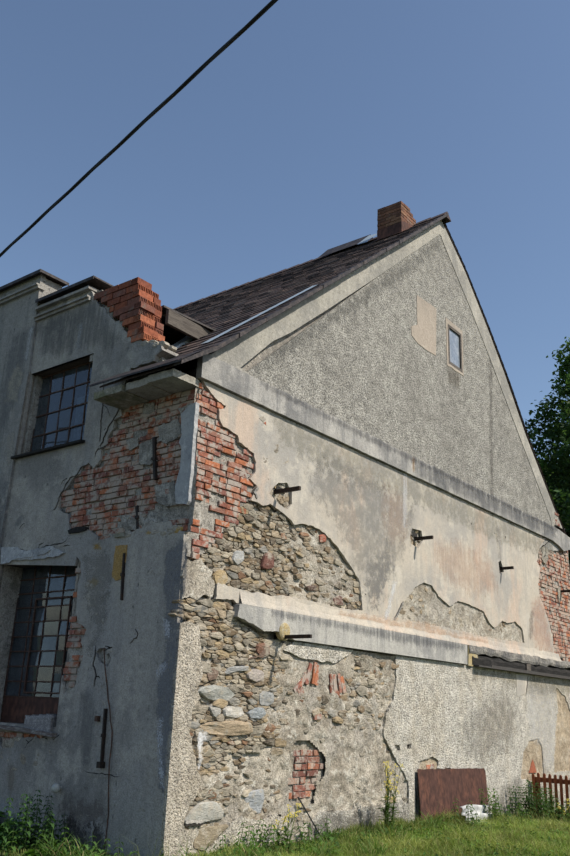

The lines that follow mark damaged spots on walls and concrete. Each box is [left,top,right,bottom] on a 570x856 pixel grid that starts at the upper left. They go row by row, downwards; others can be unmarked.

peeling [1,546,64,564]
spalling [61,382,449,855]
spalling [395,583,523,642]
spalling [537,536,570,662]
peeling [521,739,543,781]
peeling [554,689,570,773]